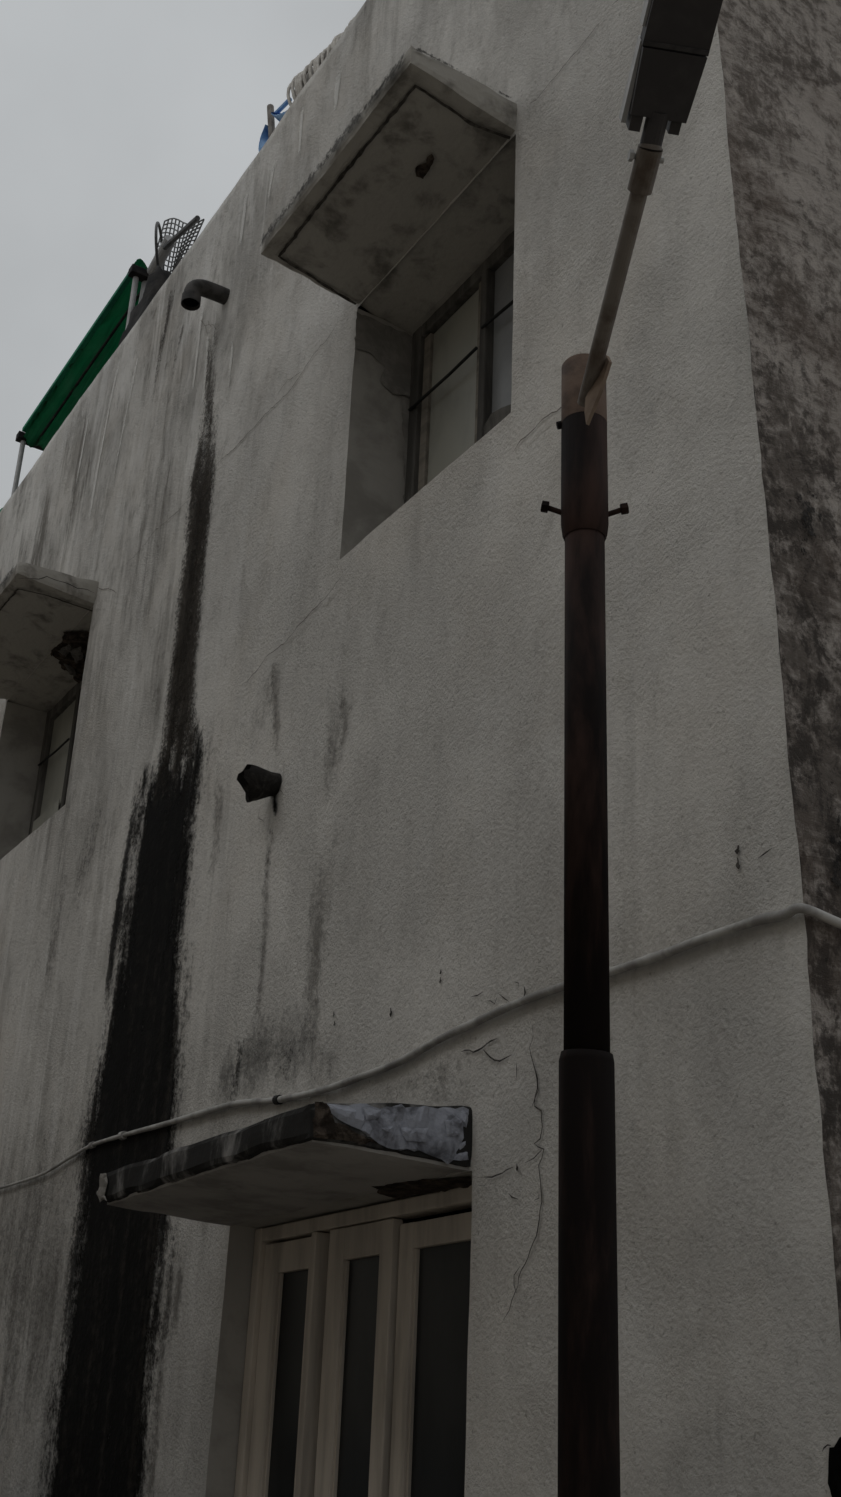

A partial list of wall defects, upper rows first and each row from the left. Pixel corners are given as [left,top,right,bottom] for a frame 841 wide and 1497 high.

damp [6,290,233,1497]
crack [461,982,544,1342]